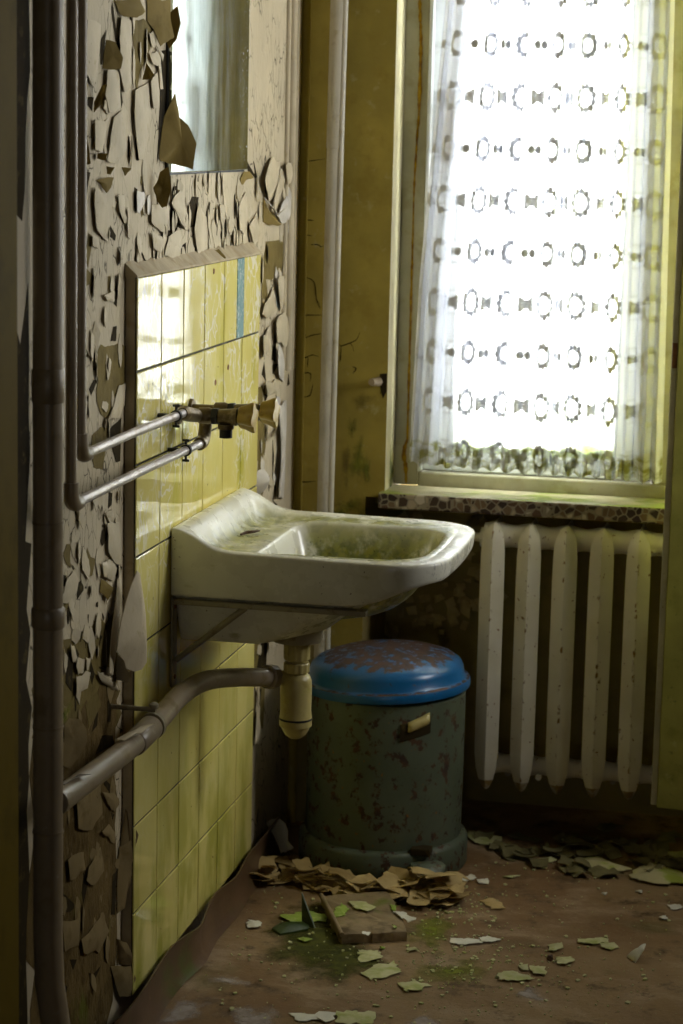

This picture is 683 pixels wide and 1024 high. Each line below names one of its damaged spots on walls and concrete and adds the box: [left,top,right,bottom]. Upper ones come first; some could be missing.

peeling [63,0,293,781]
crack [305,277,360,397]
spalling [63,774,139,1024]
damp [270,903,381,982]